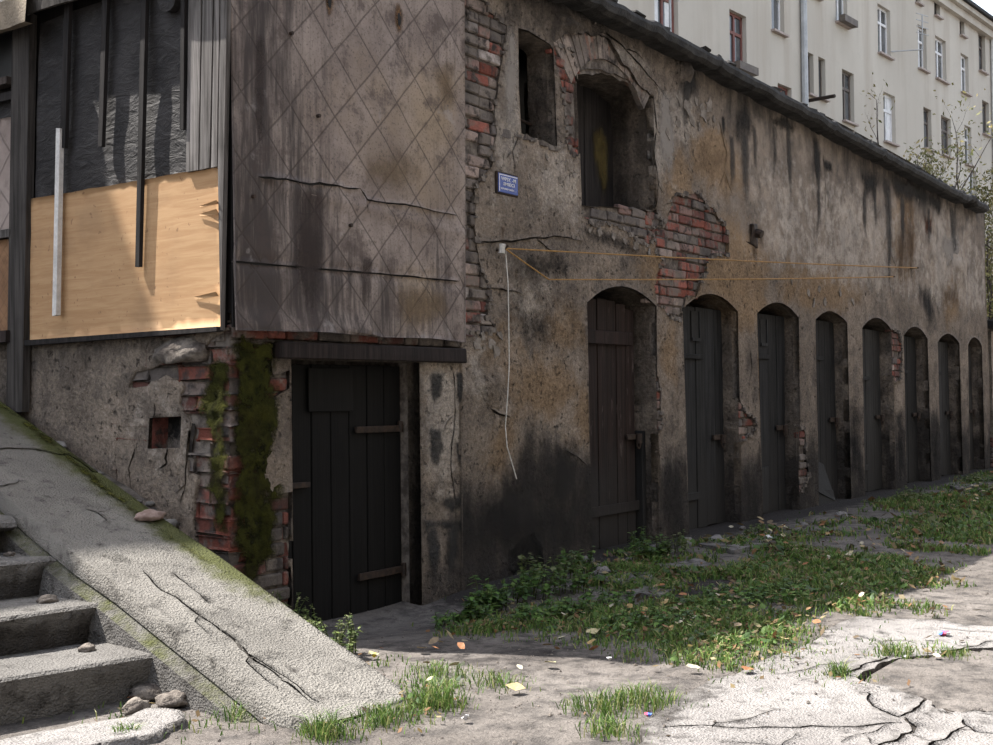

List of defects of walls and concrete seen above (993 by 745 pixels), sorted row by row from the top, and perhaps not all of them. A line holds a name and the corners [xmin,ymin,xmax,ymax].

spalling [464,0,511,358]
spalling [545,22,650,187]
spalling [581,190,730,322]
leakage [722,99,757,188]
leakage [773,116,794,181]
leakage [813,139,832,222]
leakage [862,171,959,260]
leakage [919,288,935,323]
spalling [132,331,290,605]
crack [896,696,981,745]